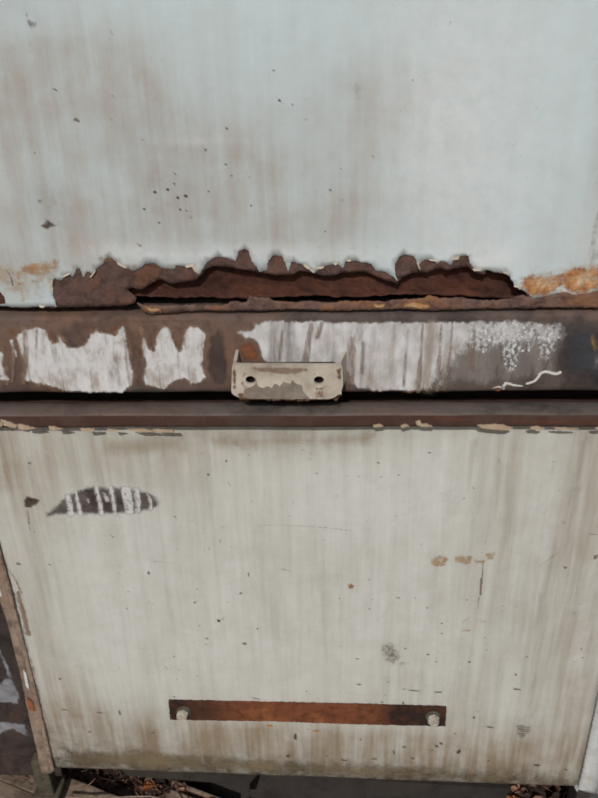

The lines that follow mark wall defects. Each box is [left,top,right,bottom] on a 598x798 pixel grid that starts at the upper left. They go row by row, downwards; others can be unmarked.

corrosion [22,249,598,315]
peeling [0,324,209,393]
corrosion [201,332,309,402]
peeling [243,378,310,399]
corrosion [302,322,323,362]
corrosion [337,343,364,384]
peeling [237,320,561,391]
corrosion [403,323,451,393]
corrosion [432,554,492,566]